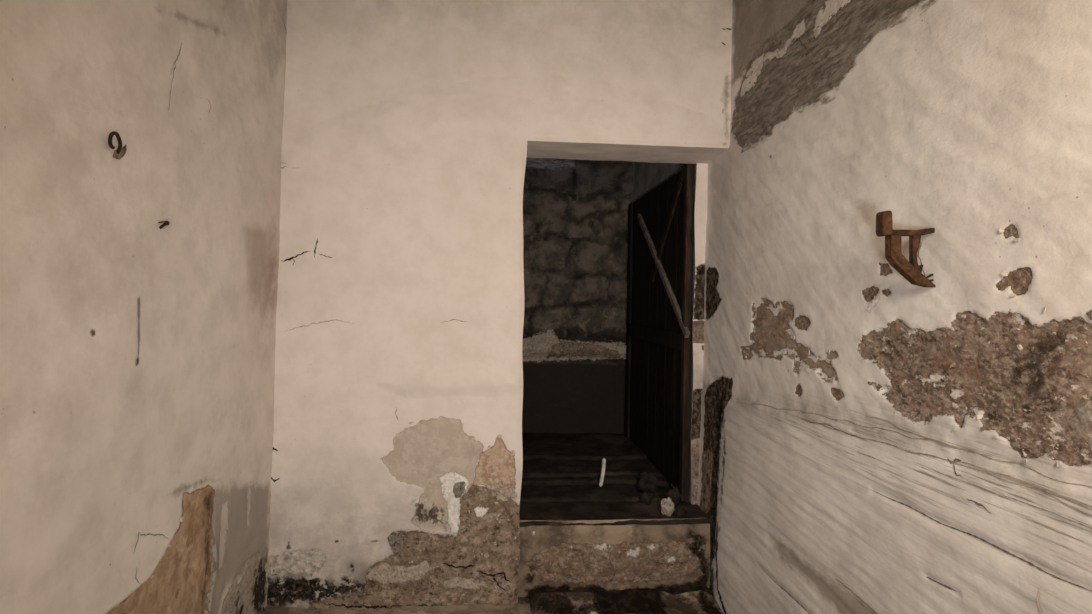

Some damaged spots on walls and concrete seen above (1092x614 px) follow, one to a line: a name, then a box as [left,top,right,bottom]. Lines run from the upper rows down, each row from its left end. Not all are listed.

peeling [731,0,934,152]
flaking render [859,262,893,302]
flaking render [999,224,1021,242]
flaking render [996,267,1033,297]
flaking render [740,298,844,401]
flaking render [857,308,1092,467]
flaking render [107,485,216,614]
leakage [218,500,228,570]
peeling [381,416,516,534]
leakage [221,471,722,614]
flaking render [526,376,733,596]